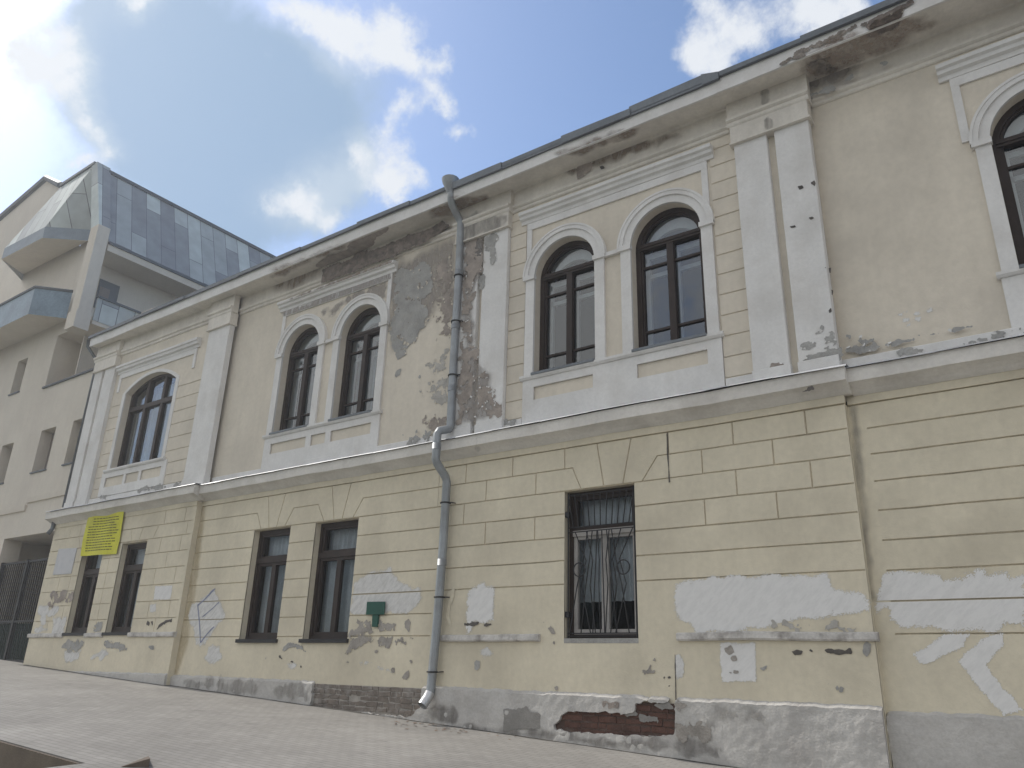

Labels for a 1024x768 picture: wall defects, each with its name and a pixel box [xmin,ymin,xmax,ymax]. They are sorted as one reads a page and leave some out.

flaking render [779,0,914,80]
flaking render [576,162,605,180]
flaking render [316,220,449,283]
peeling [388,232,516,445]
peeling [799,325,1006,361]
crack [664,433,672,482]
peeling [345,619,413,663]
flaking render [555,699,712,744]